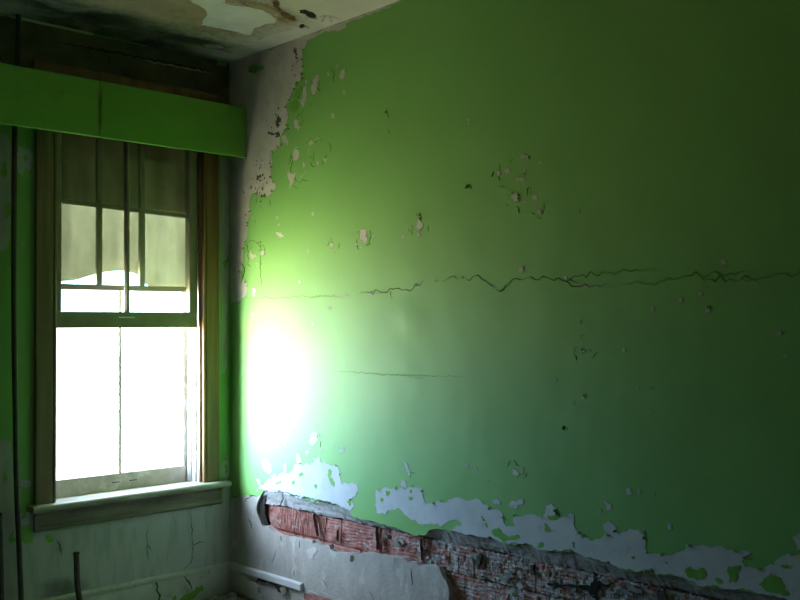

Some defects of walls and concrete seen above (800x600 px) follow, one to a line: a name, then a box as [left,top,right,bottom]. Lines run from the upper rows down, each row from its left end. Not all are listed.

leakage [57,0,236,46]
leakage [225,0,286,19]
peeling [190,0,398,375]
crack [241,240,800,299]
crack [333,371,462,379]
flaking render [0,424,800,600]
crack [184,516,201,591]